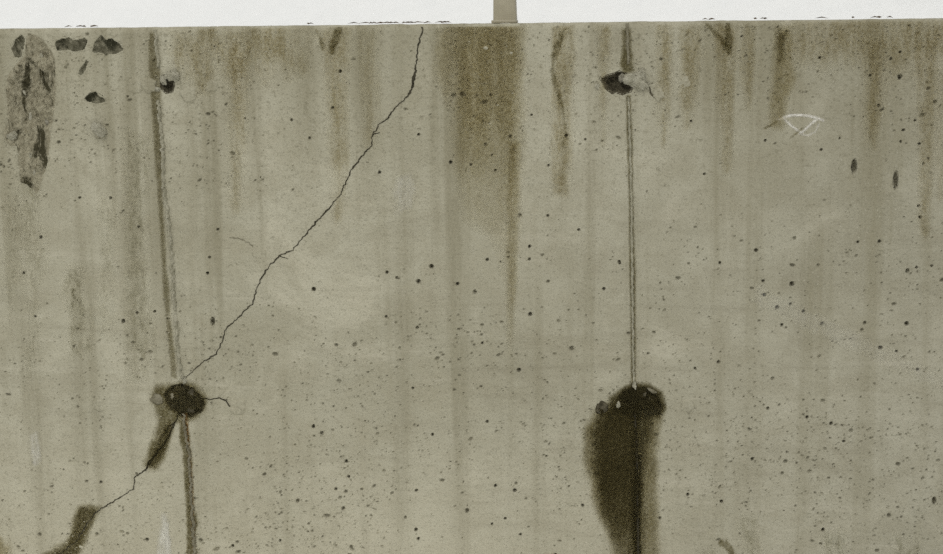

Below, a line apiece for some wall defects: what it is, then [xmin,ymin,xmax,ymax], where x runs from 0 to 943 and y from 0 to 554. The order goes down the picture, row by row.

spalling [1,32,125,196]
crack [186,27,423,377]
crack [59,397,230,554]
damp [600,386,663,553]